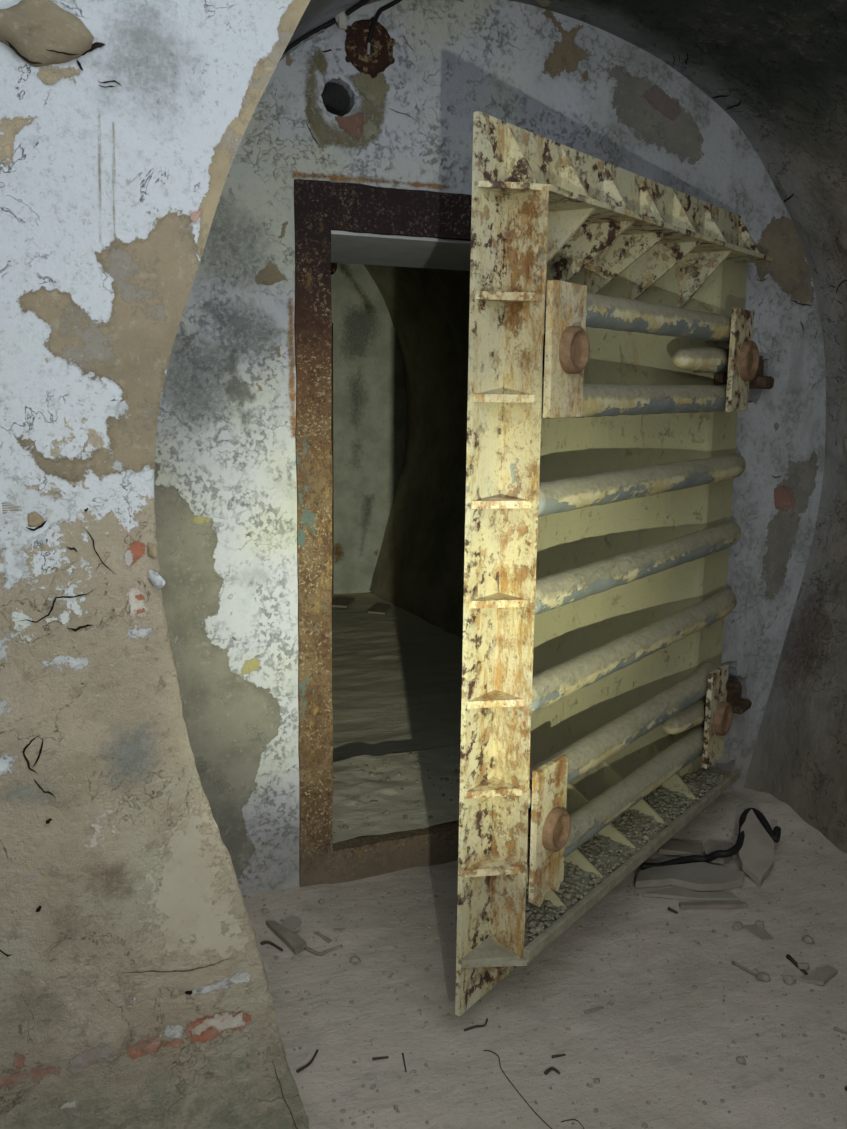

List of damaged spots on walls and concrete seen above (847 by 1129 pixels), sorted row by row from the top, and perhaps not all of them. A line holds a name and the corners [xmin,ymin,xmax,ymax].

spalling [0,0,105,90]
peeling [535,0,589,82]
peeling [304,49,390,148]
peeling [603,65,704,170]
rust [293,173,449,189]
peeling [755,216,815,306]
rust [288,299,296,436]
peeling [16,0,310,879]
crack [22,508,115,632]
crack [23,734,56,799]
flaking render [126,1009,252,1059]